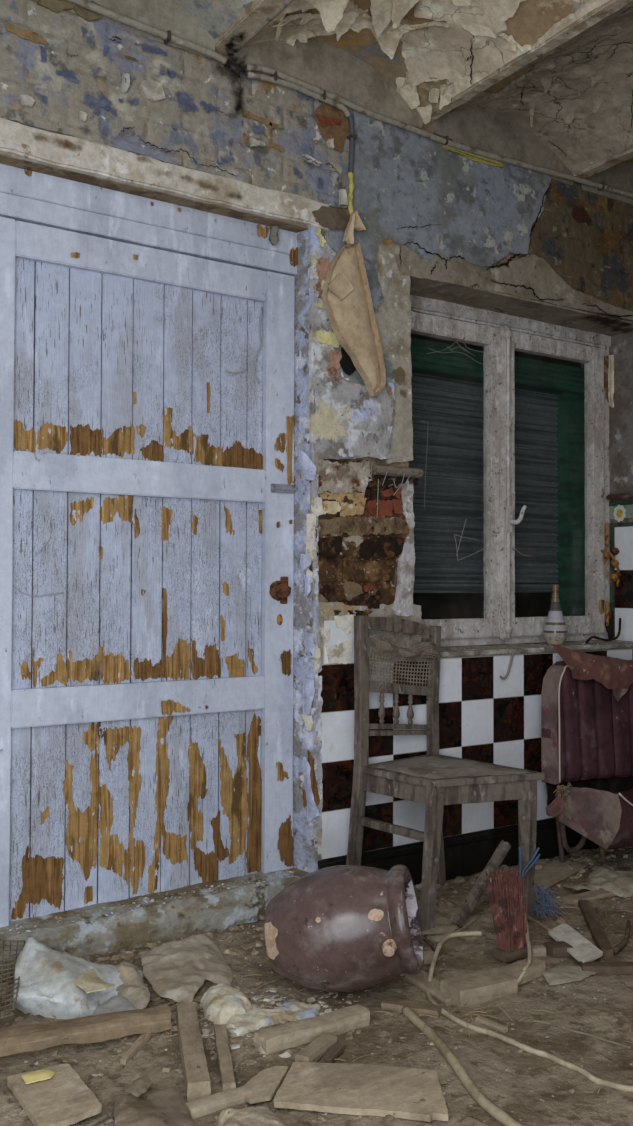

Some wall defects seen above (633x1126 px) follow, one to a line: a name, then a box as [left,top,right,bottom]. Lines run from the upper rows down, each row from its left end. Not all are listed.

peeling [56,43,220,122]
peeling [246,0,633,174]
crack [466,38,474,85]
crack [553,35,633,127]
peeling [290,247,298,267]
crack [396,186,633,317]
spalling [315,330,356,384]
spalling [13,406,415,731]
peeling [11,699,262,920]
peeling [276,761,289,781]
peeling [277,815,294,867]
peeling [302,757,319,821]